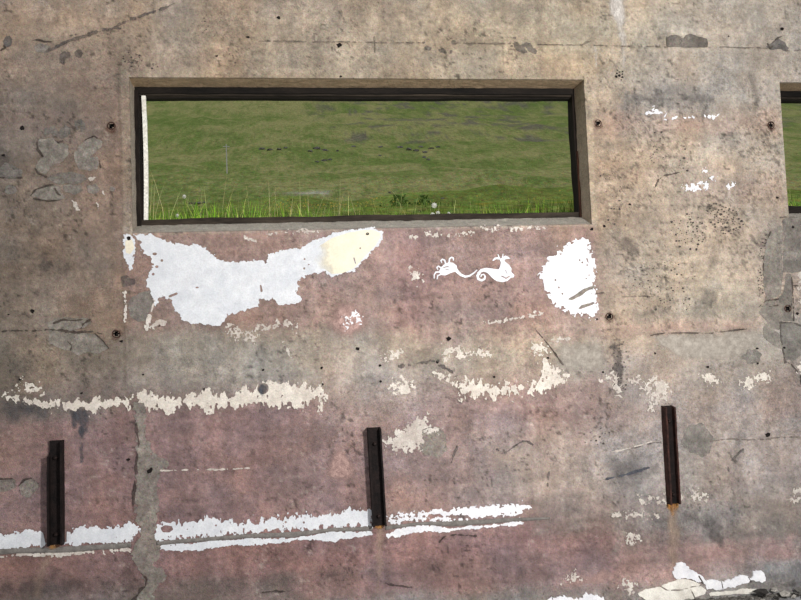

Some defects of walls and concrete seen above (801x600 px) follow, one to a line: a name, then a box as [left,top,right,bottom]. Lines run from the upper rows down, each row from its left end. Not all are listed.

peeling [123,227,383,345]
peeling [538,237,599,321]
spalling [739,216,801,390]
peeling [432,336,571,402]
peeling [1,376,328,418]
peeling [382,412,443,455]
crack [132,423,140,506]
peeling [0,521,141,558]
peeling [154,506,373,552]
peeling [386,500,532,539]
peeling [548,592,604,600]
peeling [617,562,766,600]